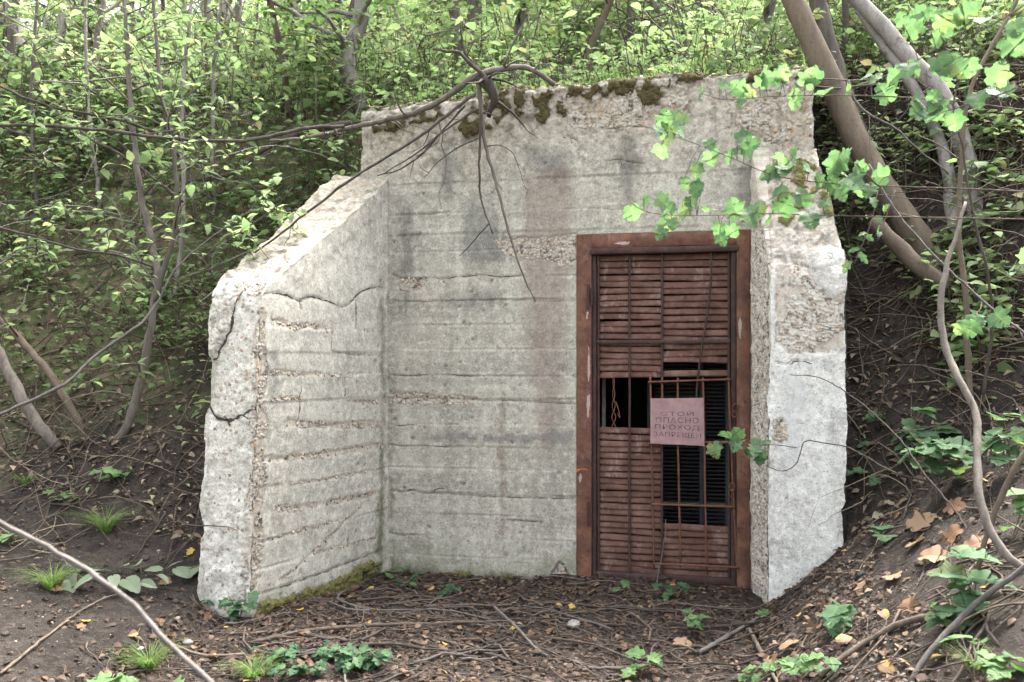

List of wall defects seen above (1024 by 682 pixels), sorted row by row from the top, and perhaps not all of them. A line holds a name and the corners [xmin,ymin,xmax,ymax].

spalling [496,233,577,267]
crack [213,276,376,361]
crack [210,406,256,426]